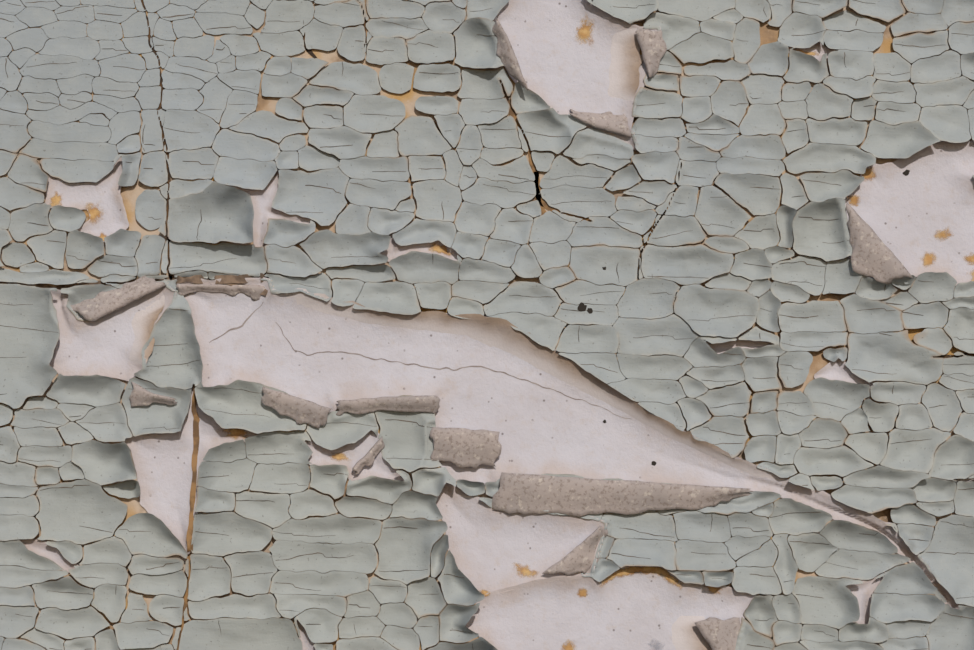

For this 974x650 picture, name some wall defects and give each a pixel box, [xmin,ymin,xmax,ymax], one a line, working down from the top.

peeling [0,235,203,650]
crack [177,384,200,650]
peeling [0,0,467,285]
crack [0,0,630,419]
peeling [453,0,510,69]
peeling [176,64,974,650]
crack [637,162,682,279]
peeling [492,0,974,392]
crack [933,351,974,359]